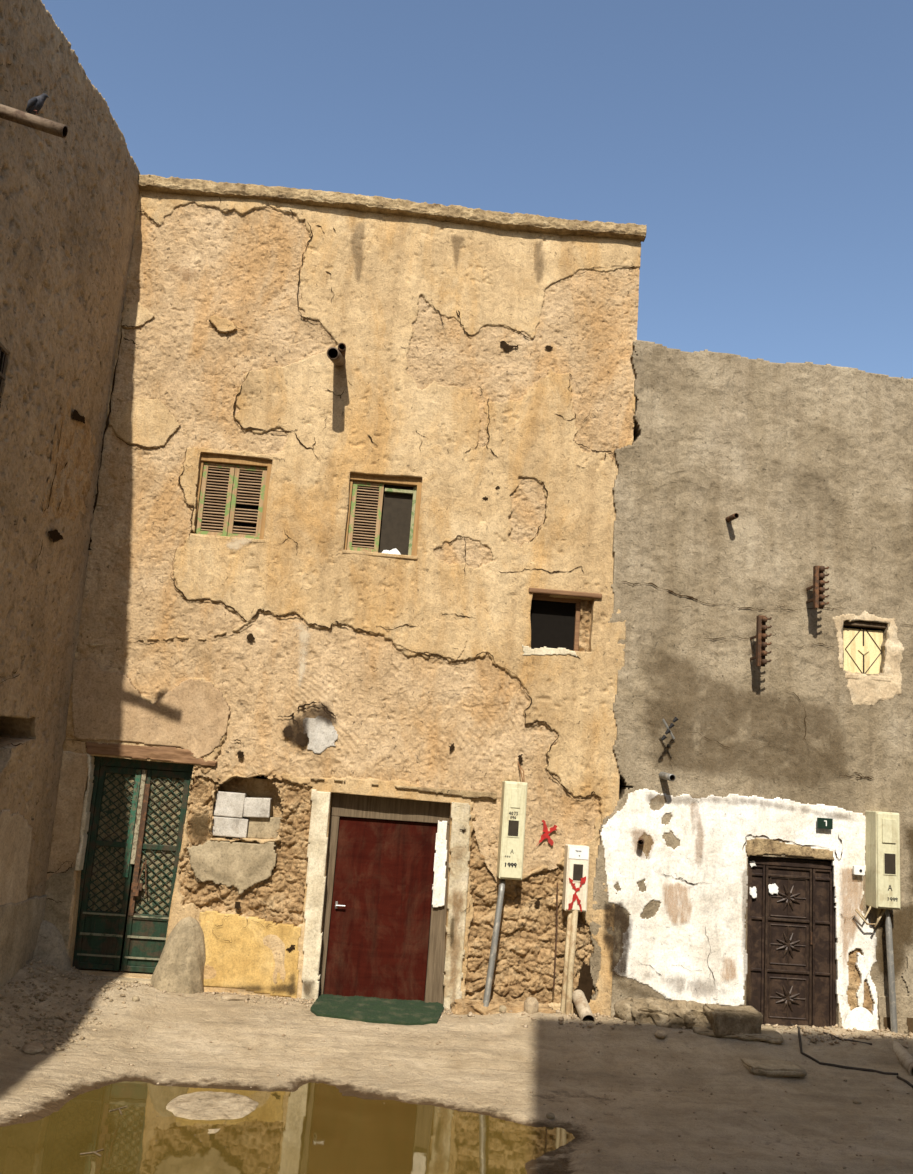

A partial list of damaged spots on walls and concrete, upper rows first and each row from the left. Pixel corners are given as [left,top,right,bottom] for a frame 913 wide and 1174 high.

crack [138,197,339,344]
flaking render [75,203,601,1004]
crack [171,448,602,822]
peeling [638,795,679,858]
peeling [637,880,661,919]
spalling [846,948,873,1013]
peeling [902,949,913,995]